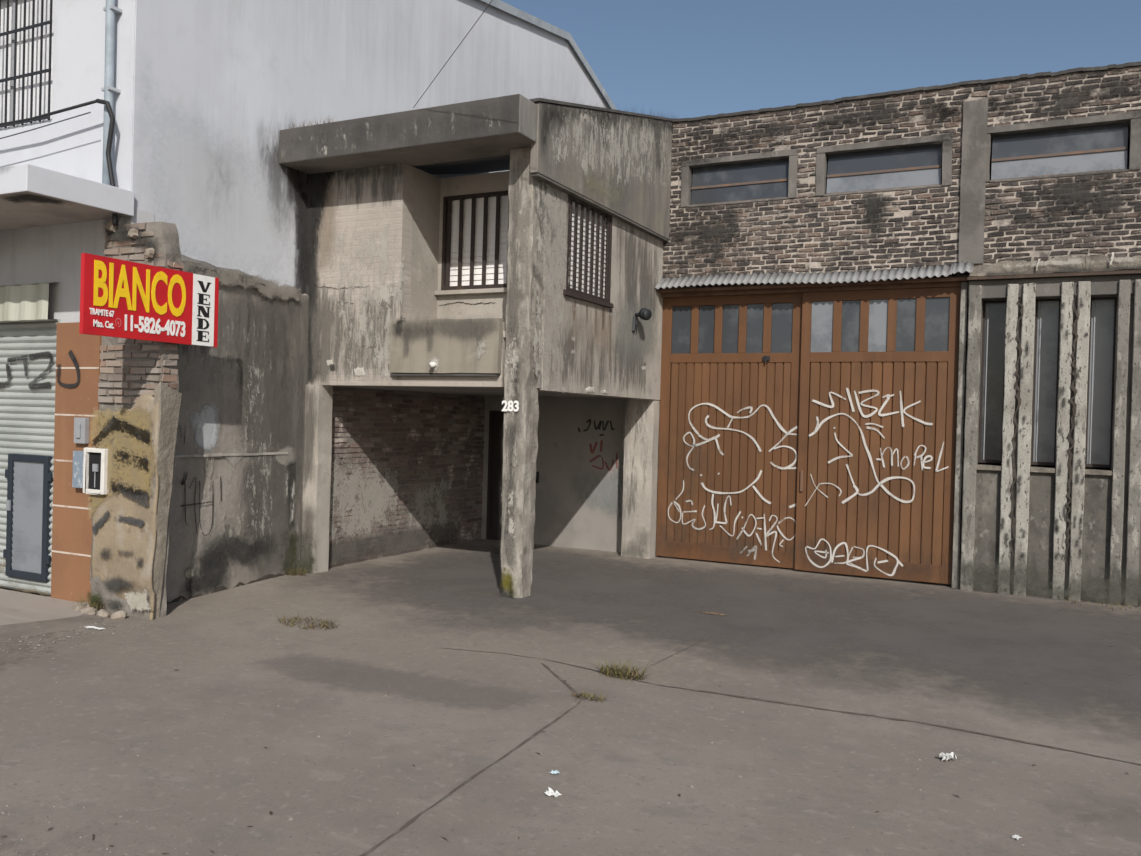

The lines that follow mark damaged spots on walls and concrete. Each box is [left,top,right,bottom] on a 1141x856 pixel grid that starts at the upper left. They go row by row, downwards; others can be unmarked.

damp [988,76,1141,114]
damp [679,98,963,161]
damp [1014,179,1141,228]
damp [270,148,381,381]
damp [673,206,742,268]
damp [610,305,652,361]
flaking render [98,338,179,404]
damp [188,298,312,594]
flaking render [104,578,151,611]
damp [328,458,1141,719]
crack [360,629,1141,856]